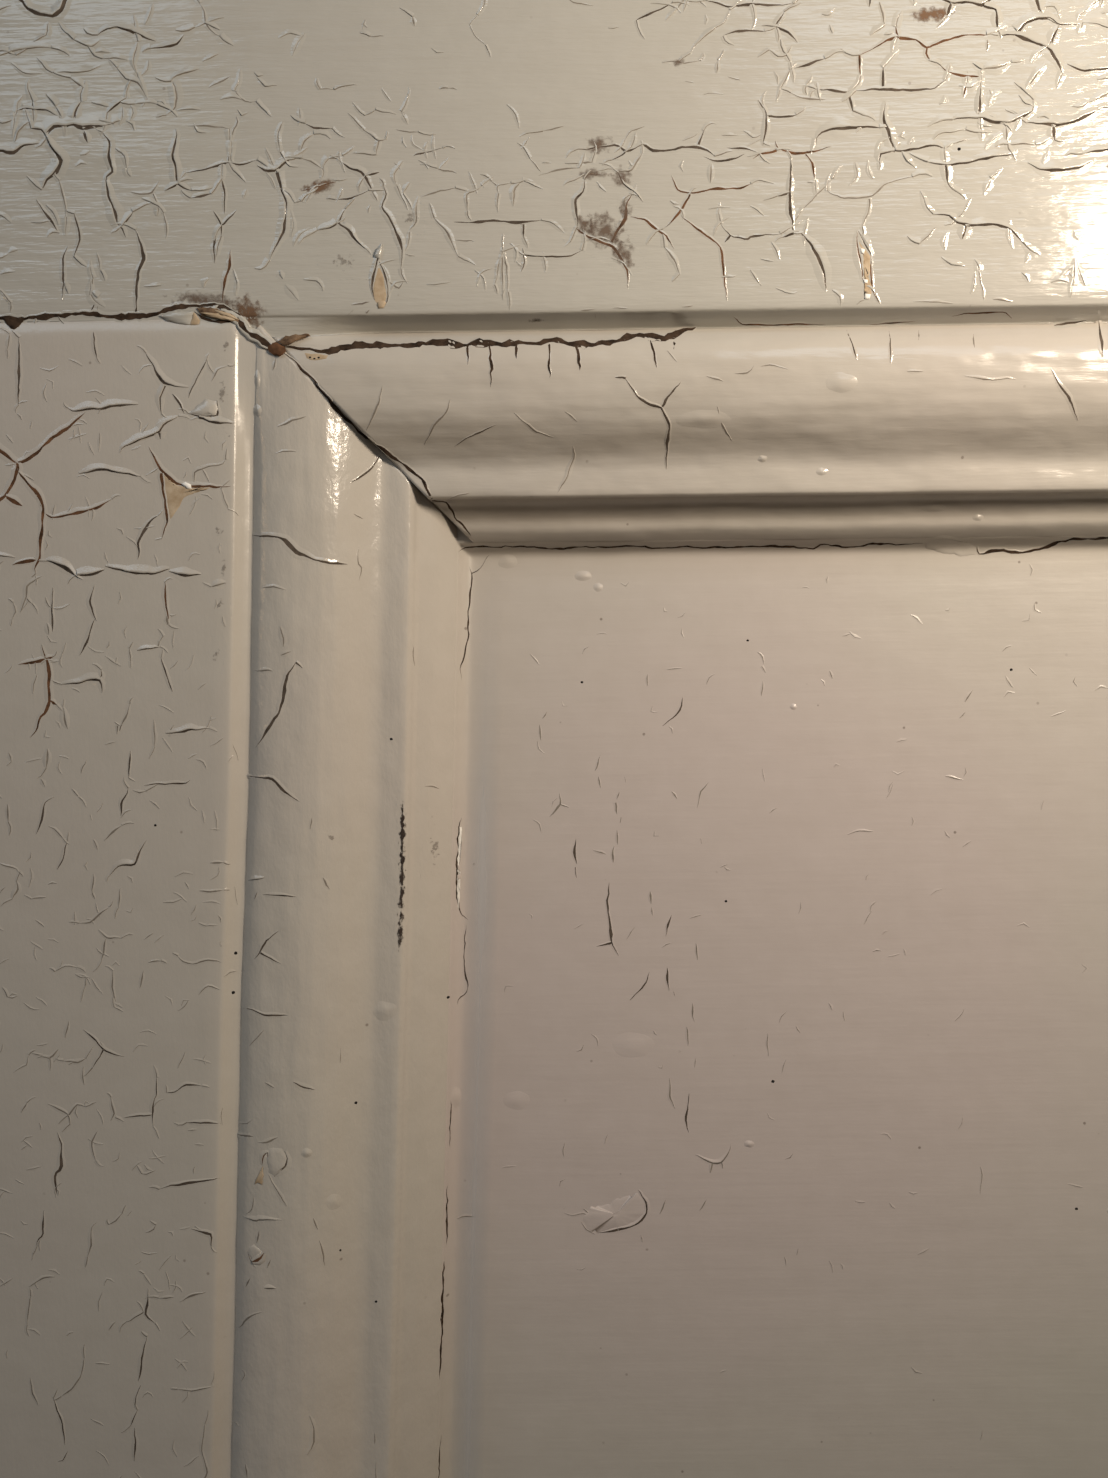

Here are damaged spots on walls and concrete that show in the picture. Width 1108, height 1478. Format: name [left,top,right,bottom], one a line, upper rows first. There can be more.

peeling [368,243,391,309]
crack [0,1021,278,1337]
crack [243,1007,288,1047]
crack [265,1081,315,1092]
crack [446,1104,454,1145]
crack [533,755,732,1242]
crack [236,1174,327,1329]
crack [438,1186,475,1377]
crack [29,1331,110,1462]
crack [435,1439,443,1478]